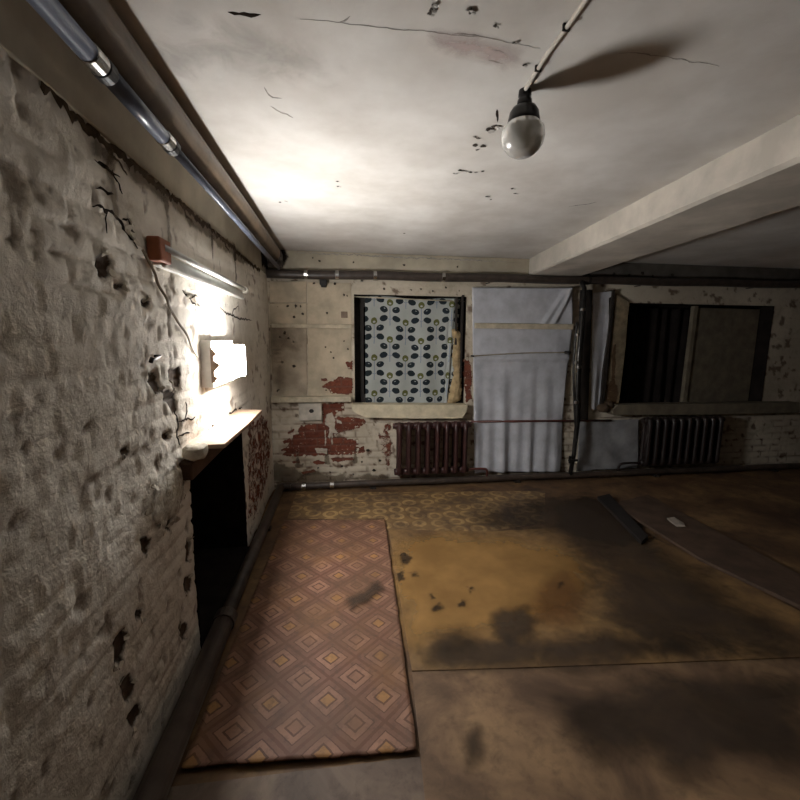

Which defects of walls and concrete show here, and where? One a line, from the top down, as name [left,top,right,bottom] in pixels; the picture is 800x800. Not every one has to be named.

crack [303,16,535,48]
crack [40,81,193,249]
spalling [95,247,130,292]
crack [209,224,260,272]
crack [182,290,200,314]
crack [220,306,252,321]
peeling [463,356,473,402]
crack [174,403,214,445]
peeling [245,414,271,521]
peeling [281,361,370,475]
peeling [372,421,394,472]
spalling [112,628,144,736]